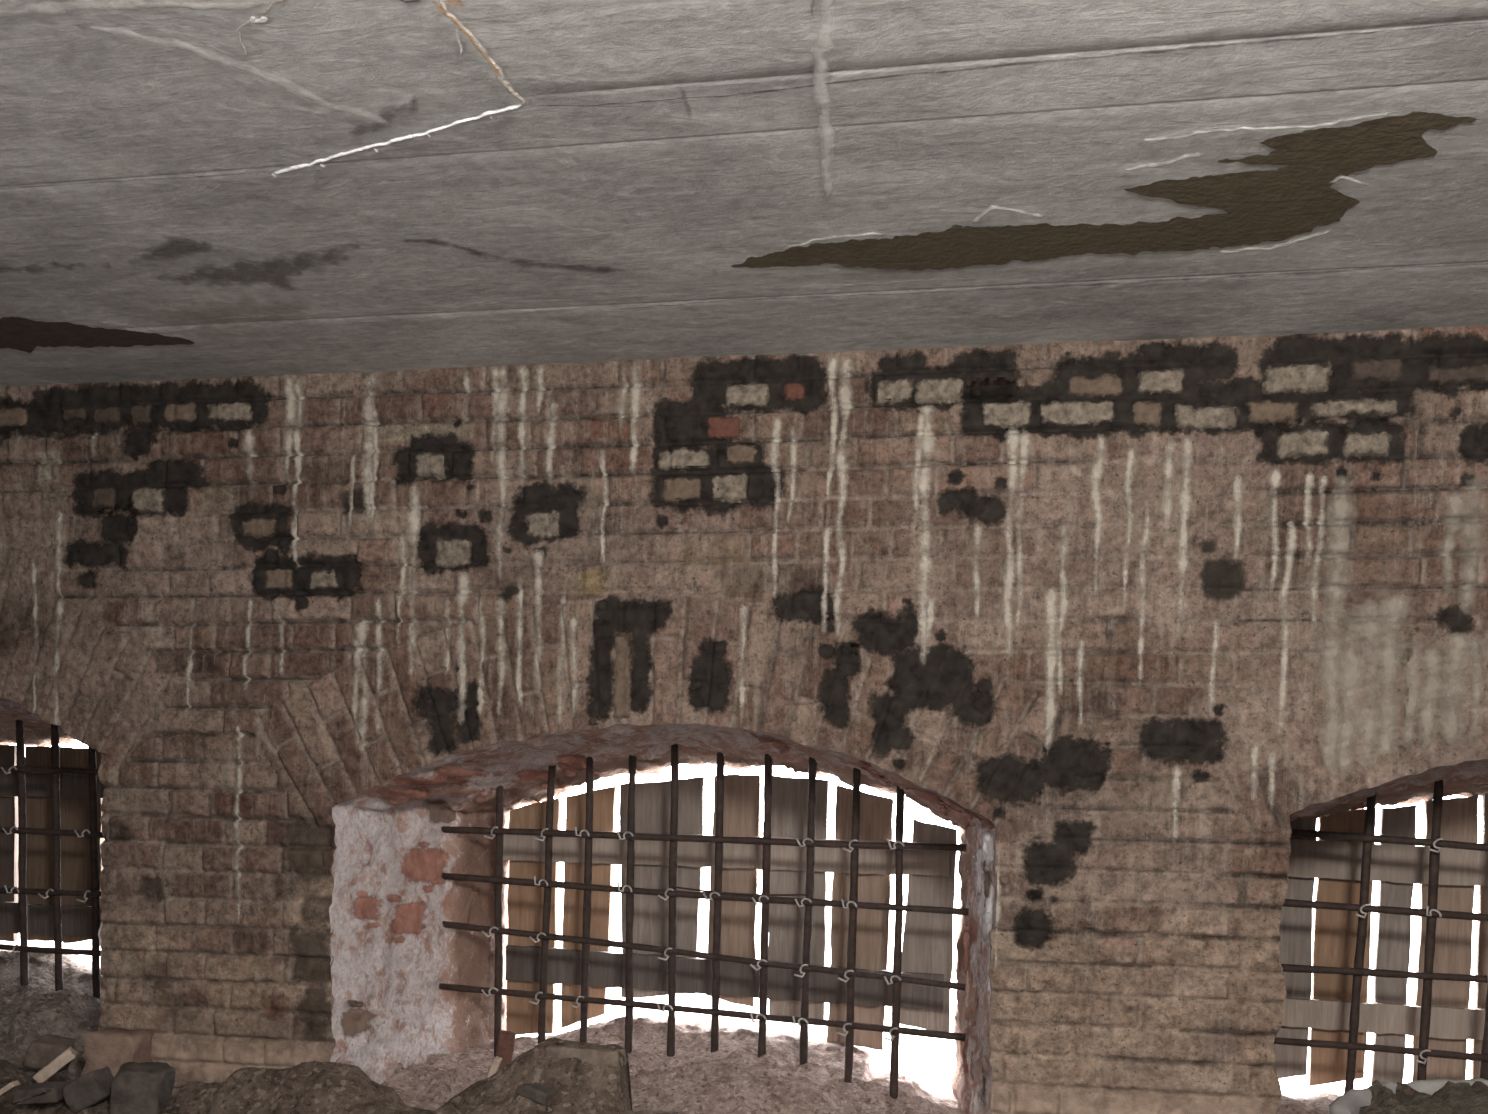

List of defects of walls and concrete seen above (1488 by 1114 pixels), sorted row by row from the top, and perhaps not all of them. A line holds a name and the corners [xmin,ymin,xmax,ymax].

crack [36,0,560,179]
crack [602,0,899,194]
crack [939,62,1037,73]
crack [1142,44,1224,53]
crack [1265,32,1376,43]
damp [0,377,364,725]
damp [342,368,586,755]
damp [619,331,1488,770]
damp [978,527,1112,818]
peeling [377,761,487,823]
peeling [352,842,448,943]
damp [978,820,1096,992]